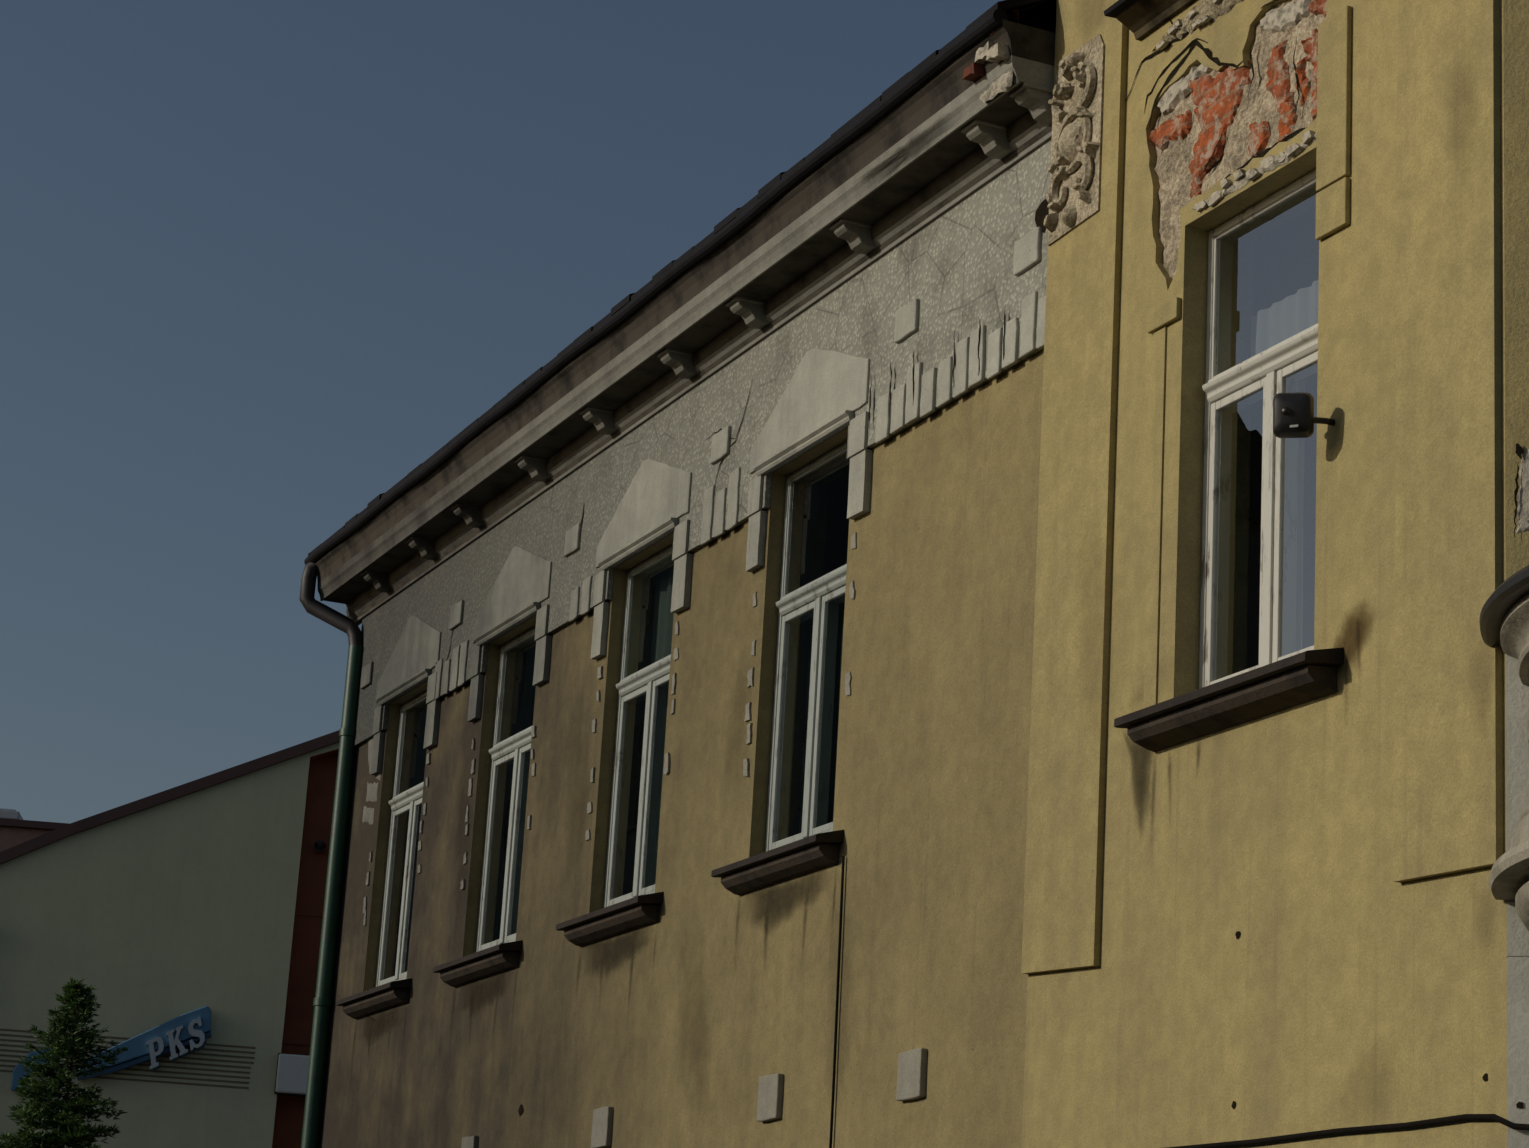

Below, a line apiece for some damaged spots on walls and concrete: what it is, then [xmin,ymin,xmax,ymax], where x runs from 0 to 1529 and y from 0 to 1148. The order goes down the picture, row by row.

crack [1125,19,1209,112]
spalling [1149,0,1327,279]